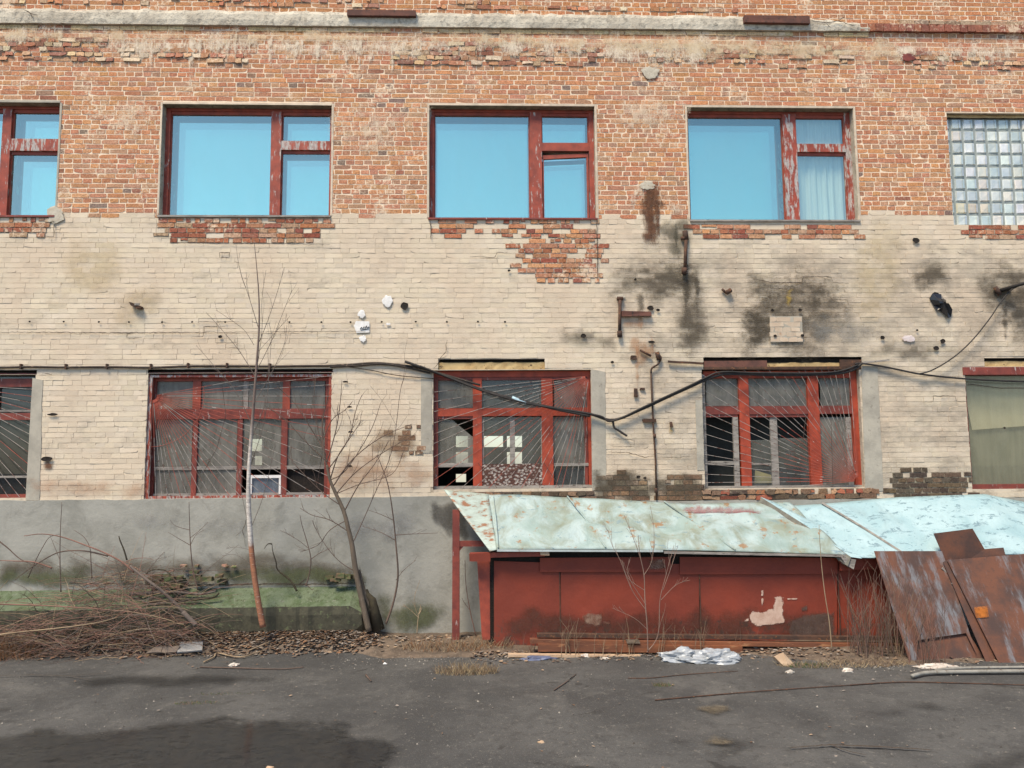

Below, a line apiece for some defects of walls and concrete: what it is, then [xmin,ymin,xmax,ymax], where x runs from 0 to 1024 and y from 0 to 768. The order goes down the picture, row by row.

peeling [0,217,52,238]
peeling [153,218,335,243]
leakage [661,204,688,254]
peeling [961,225,1024,240]
peeling [430,219,609,283]
leakage [683,278,699,307]
peeling [384,425,426,455]
spalling [474,467,980,501]
peeling [745,590,797,626]